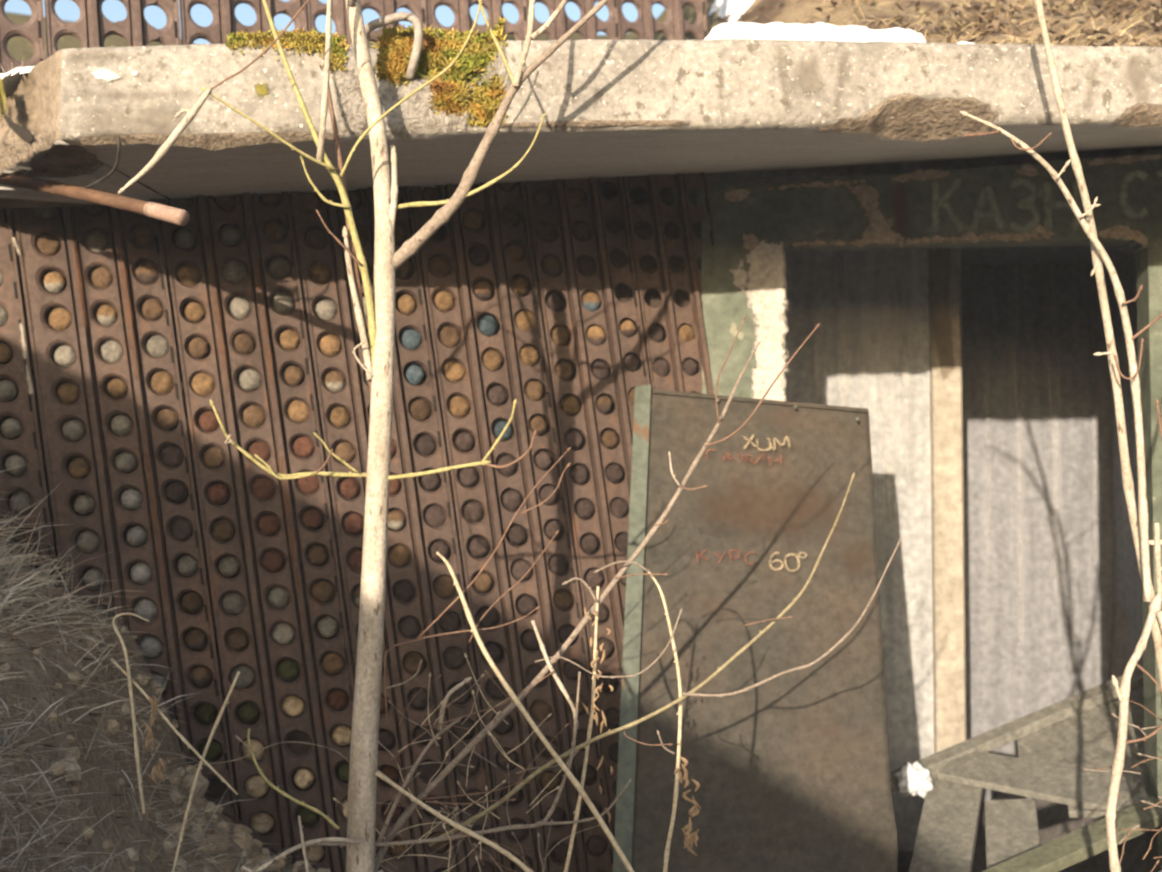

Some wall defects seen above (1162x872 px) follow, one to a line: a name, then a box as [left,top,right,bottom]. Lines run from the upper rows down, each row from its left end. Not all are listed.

spalling [376,42,511,138]
spalling [0,67,369,178]
spalling [820,93,997,142]
spalling [1115,103,1162,127]
peeling [890,168,951,183]
peeling [1087,153,1162,167]
peeling [1097,223,1149,248]
peeling [729,179,1057,401]